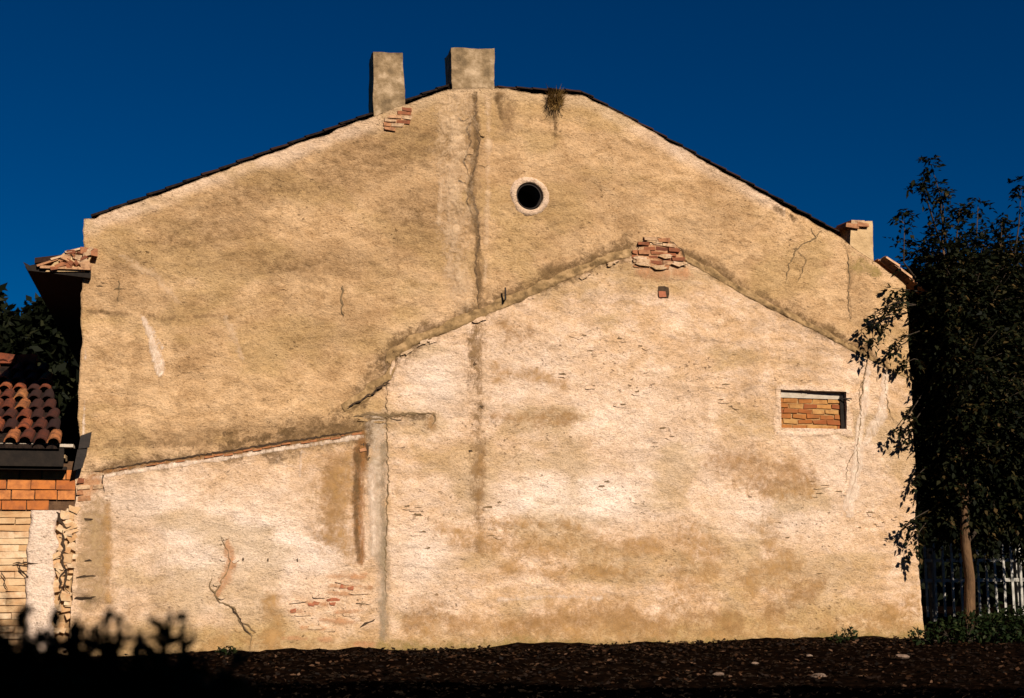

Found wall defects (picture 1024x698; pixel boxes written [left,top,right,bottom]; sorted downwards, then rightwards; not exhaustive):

peeling [384,107,412,131]
peeling [607,237,689,298]
crack [787,228,822,282]
crack [102,380,436,601]
damp [313,439,743,650]
crack [209,536,255,646]
spalling [283,573,375,641]